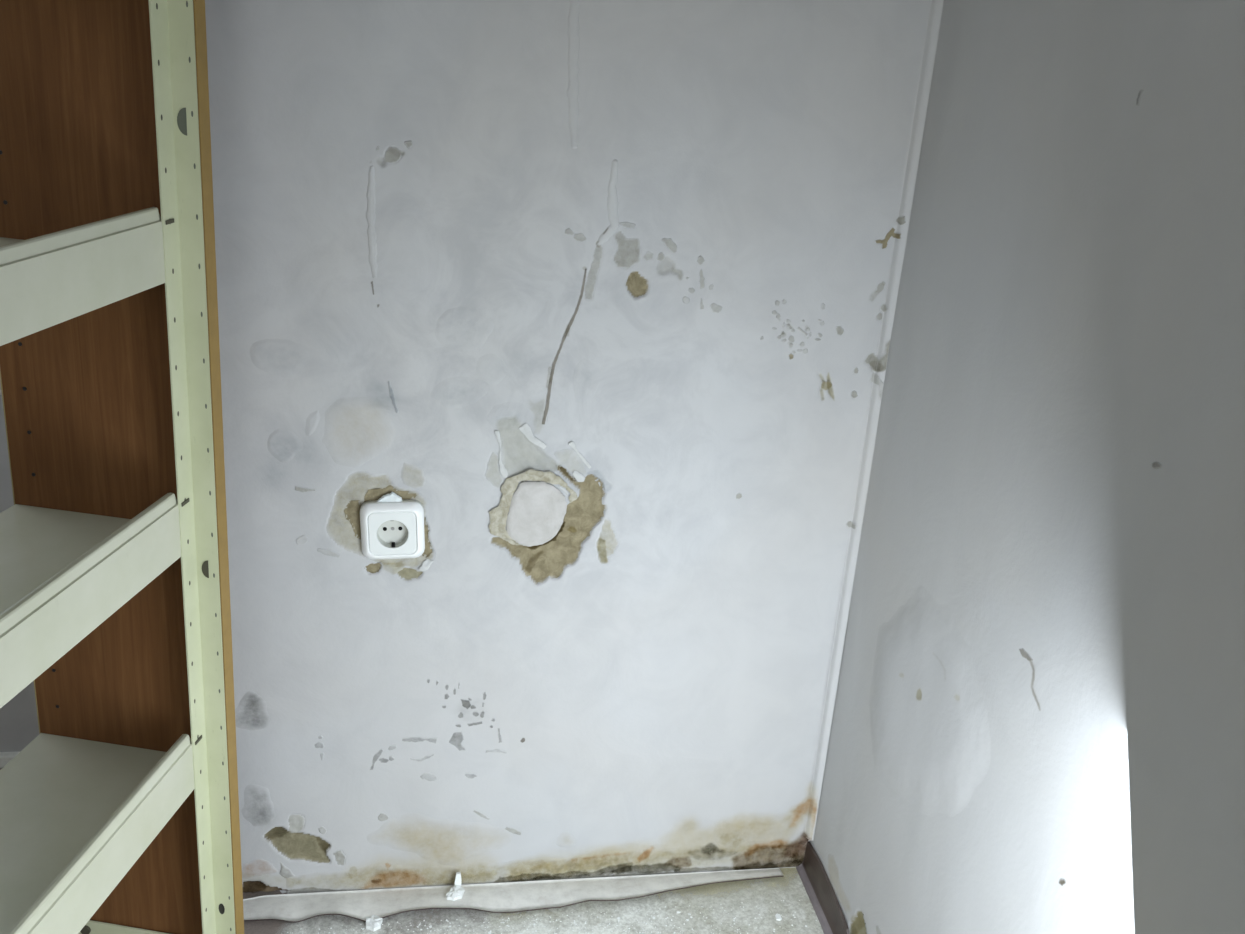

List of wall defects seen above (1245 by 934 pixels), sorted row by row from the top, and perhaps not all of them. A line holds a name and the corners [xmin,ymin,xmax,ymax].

peeling [565,222,677,300]
peeling [682,255,722,313]
crack [542,268,587,425]
spalling [296,462,434,581]
spalling [485,423,618,585]
water stain [241,784,276,827]
spalling [242,814,346,892]
water stain [286,810,677,891]